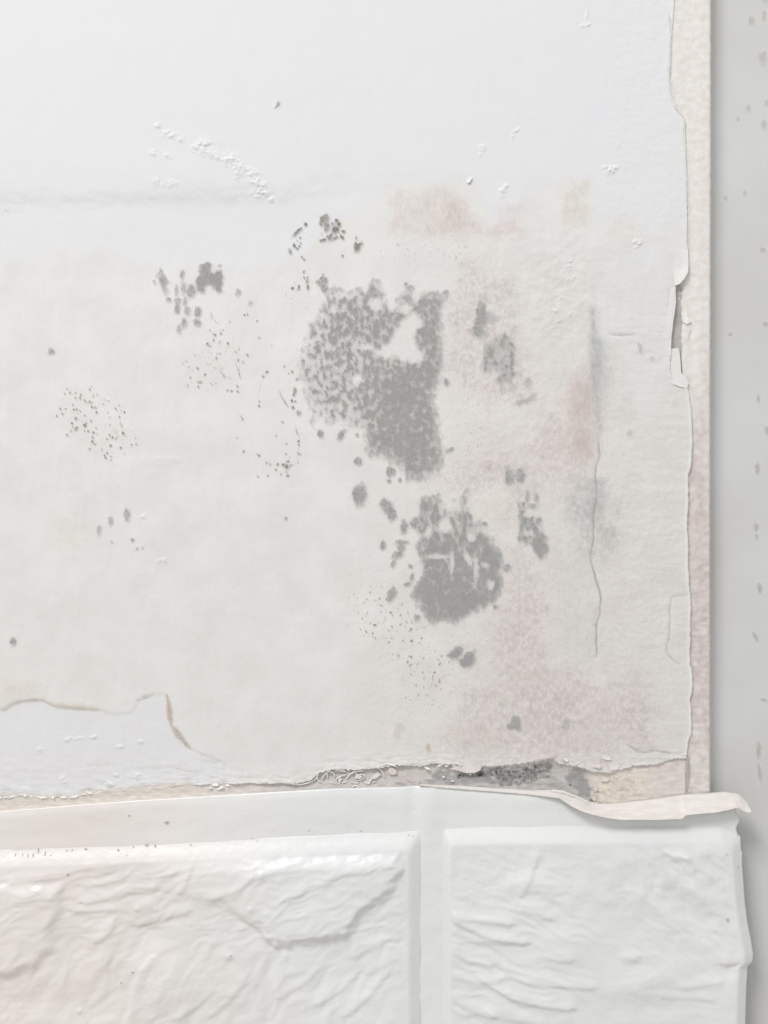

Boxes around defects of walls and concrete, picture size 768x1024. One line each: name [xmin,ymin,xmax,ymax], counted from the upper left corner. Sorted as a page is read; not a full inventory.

damp [56,386,137,461]
damp [153,261,248,392]
spalling [0,249,751,820]
damp [283,214,536,483]
damp [348,477,511,708]
damp [489,465,549,559]
crack [590,442,604,656]
damp [464,641,607,767]